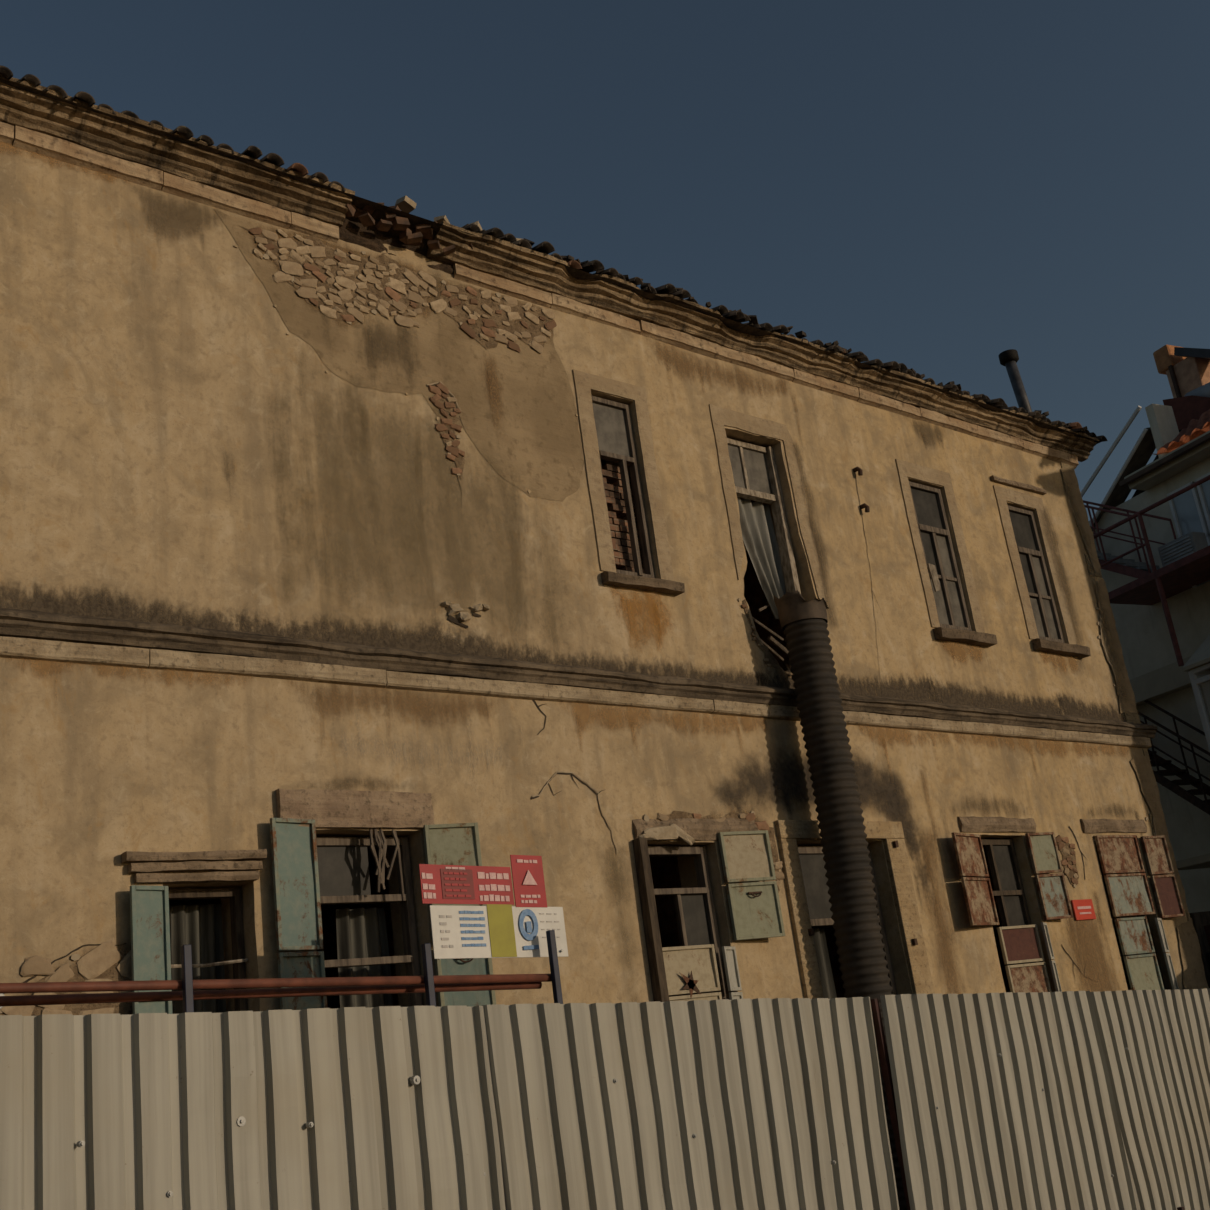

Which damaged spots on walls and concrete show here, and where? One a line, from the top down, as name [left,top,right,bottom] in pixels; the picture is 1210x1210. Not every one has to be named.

peeling [214,209,584,501]
water stain [322,422,434,592]
water stain [0,586,795,689]
water stain [837,677,1127,722]
crack [530,771,618,853]
spalling [0,937,133,1016]